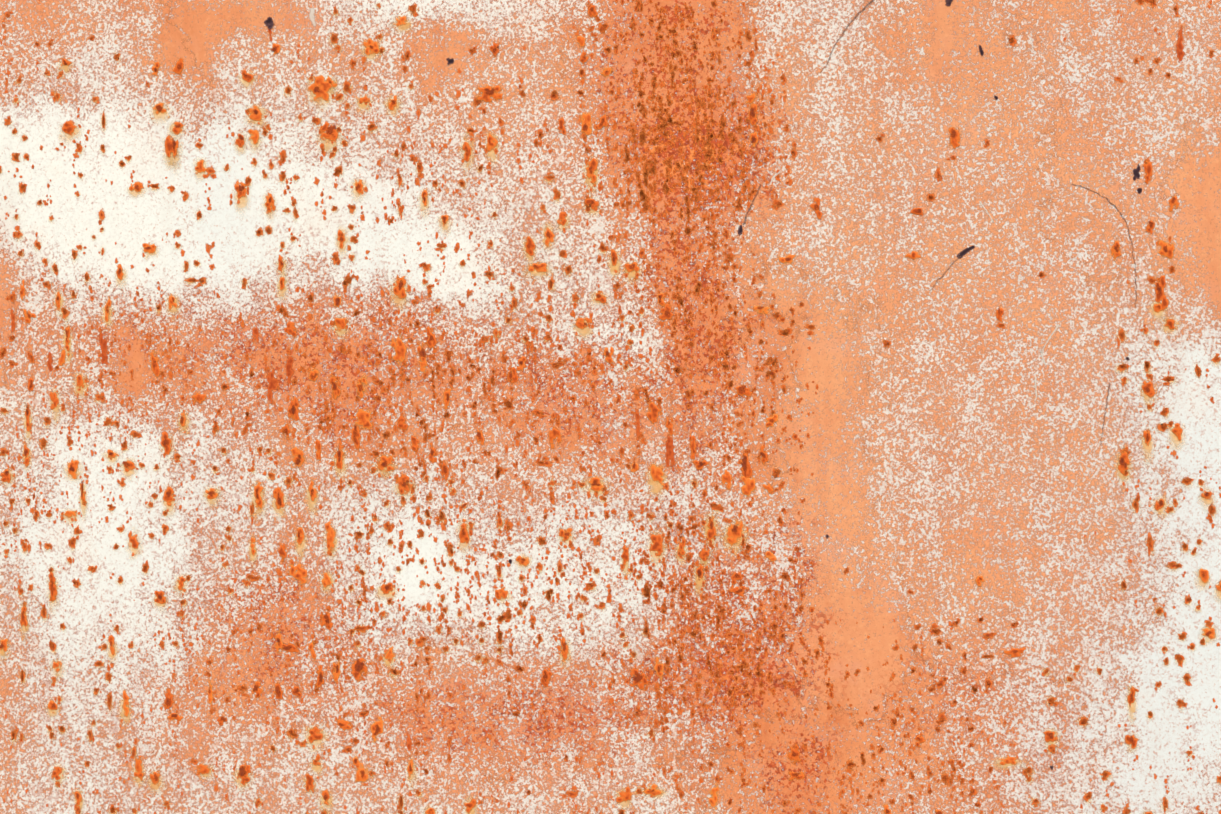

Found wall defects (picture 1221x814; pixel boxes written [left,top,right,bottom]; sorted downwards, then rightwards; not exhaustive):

rust [0,153,34,193]
rust [100,144,189,201]
rust [195,160,229,220]
rust [230,168,252,206]
rust [251,143,300,219]
rust [5,209,41,250]
rust [72,208,117,259]
rust [162,230,200,272]
rust [1198,466,1221,528]
rust [388,520,428,574]
rust [1162,617,1220,686]
rust [1145,766,1221,814]